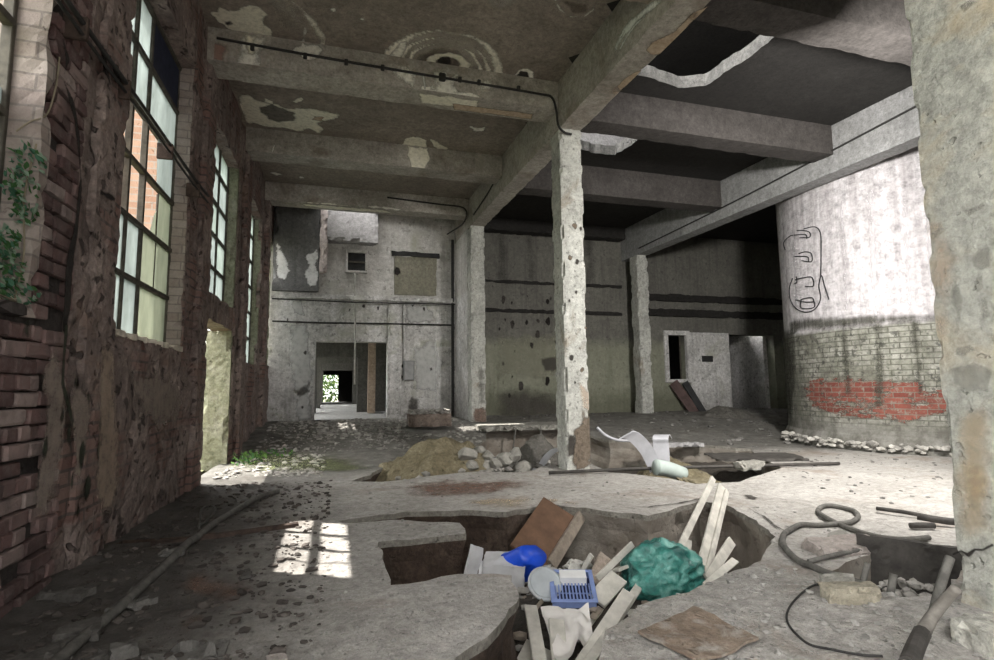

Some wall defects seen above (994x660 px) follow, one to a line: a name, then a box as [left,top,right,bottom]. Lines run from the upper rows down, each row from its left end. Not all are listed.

peeling [239,95,338,133]
spalling [419,86,533,119]
peeling [402,137,448,168]
peeling [276,244,289,279]
peeling [305,250,318,286]
leakage [782,291,920,416]